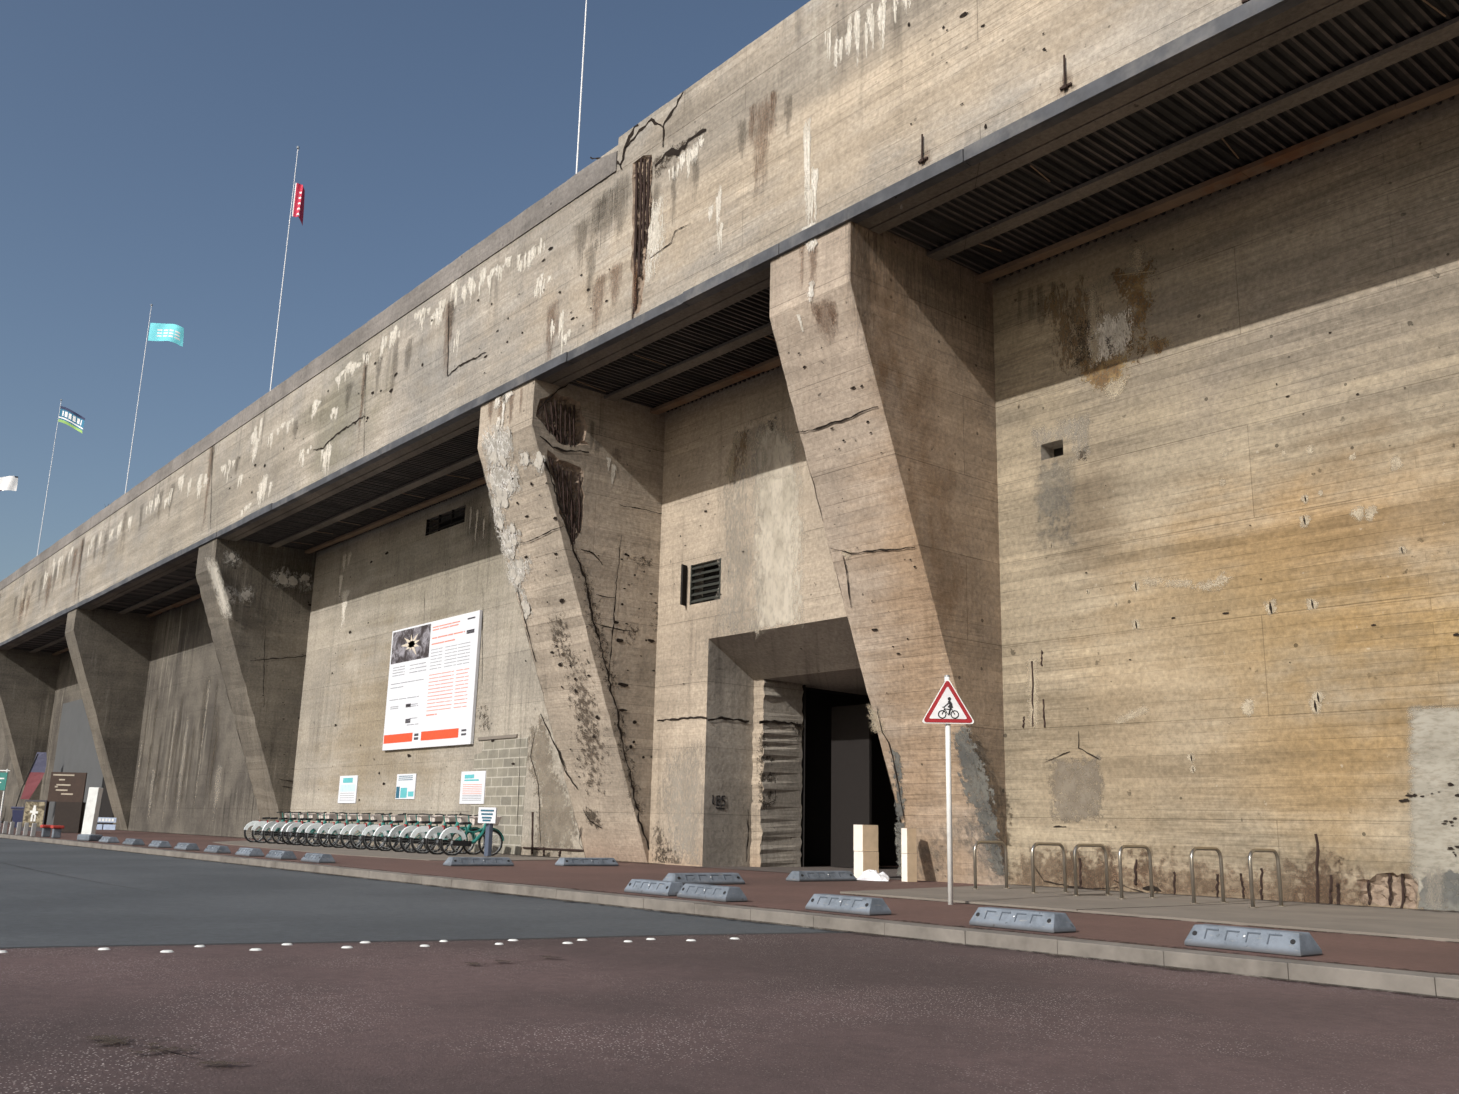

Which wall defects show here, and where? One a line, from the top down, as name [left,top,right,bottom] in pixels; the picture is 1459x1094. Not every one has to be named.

water stain [825,0,911,74]
crack [577,92,706,198]
water stain [550,309,571,355]
spalling [1044,244,1169,399]
water stain [43,237,551,595]
peeling [469,384,611,857]
crack [521,459,805,850]